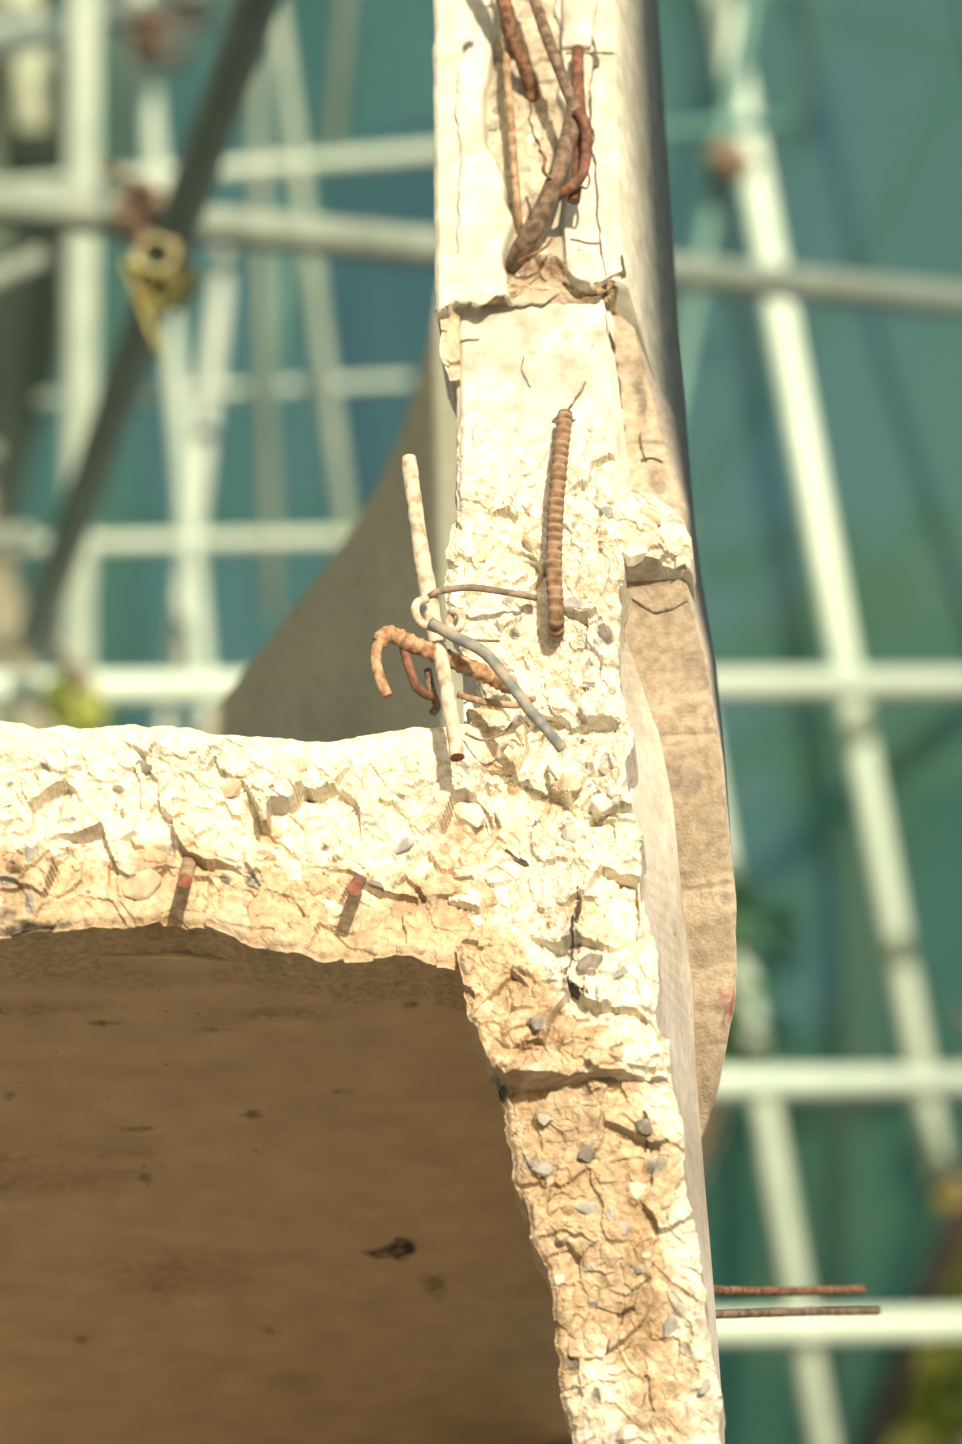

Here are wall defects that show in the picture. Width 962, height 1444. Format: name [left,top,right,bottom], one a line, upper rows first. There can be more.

spalling [487,0,560,224]
spalling [0,217,725,1444]
crack [566,886,589,1000]